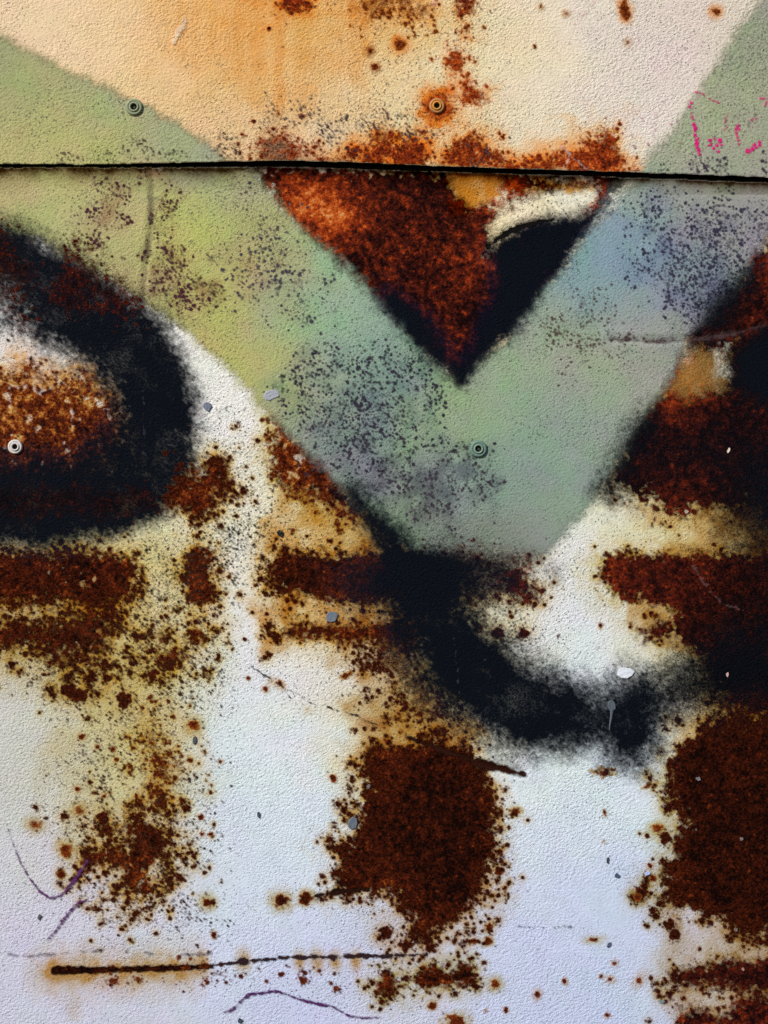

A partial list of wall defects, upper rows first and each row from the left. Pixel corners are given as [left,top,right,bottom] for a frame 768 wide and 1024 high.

corrosion [1,286,40,348]
corrosion [218,0,768,528]
corrosion [0,332,529,1011]
corrosion [473,553,555,640]
corrosion [593,542,768,1024]